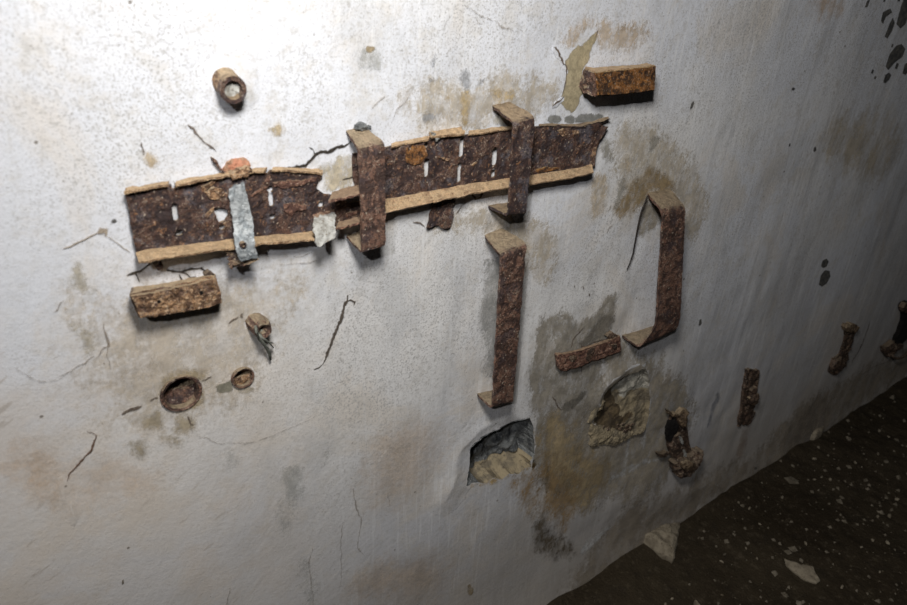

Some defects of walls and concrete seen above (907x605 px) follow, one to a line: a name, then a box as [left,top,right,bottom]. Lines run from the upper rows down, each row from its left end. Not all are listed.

crack [63,324,110,375]
crack [314,295,356,370]
flaking render [466,294,650,493]
leakage [573,350,907,590]